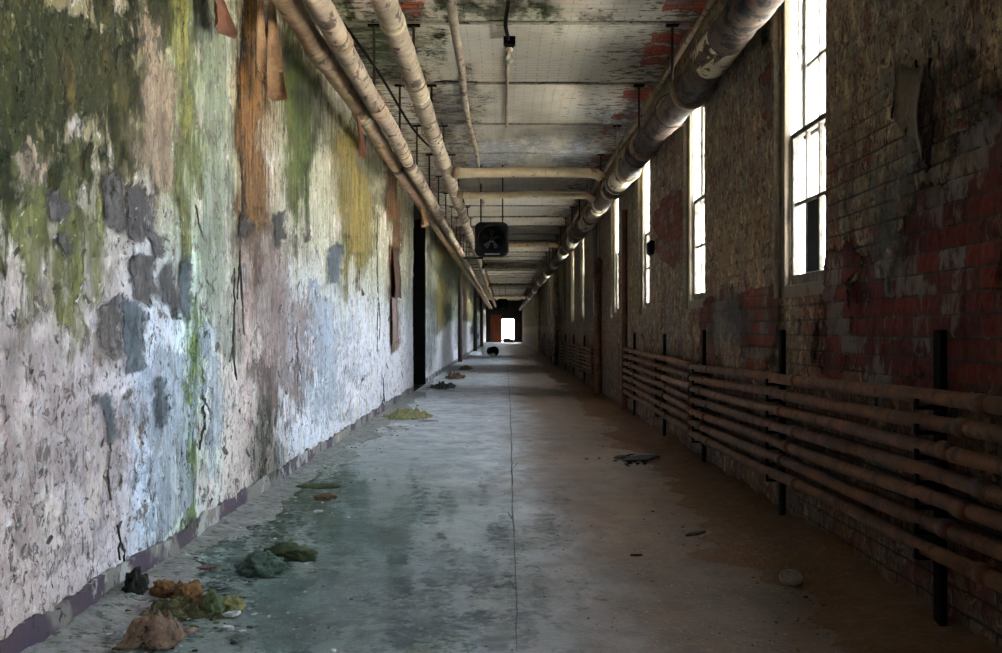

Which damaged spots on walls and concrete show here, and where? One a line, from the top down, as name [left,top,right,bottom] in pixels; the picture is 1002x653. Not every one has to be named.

flaking render [640,32,687,67]
rust [232,0,281,285]
spalling [35,184,86,261]
crack [229,42,249,380]
flaking render [652,179,683,275]
flaking render [810,93,1002,397]
spalling [75,171,212,522]
crack [199,362,212,450]
peeling [223,384,271,460]
peeling [83,490,133,538]
crack [507,368,518,650]